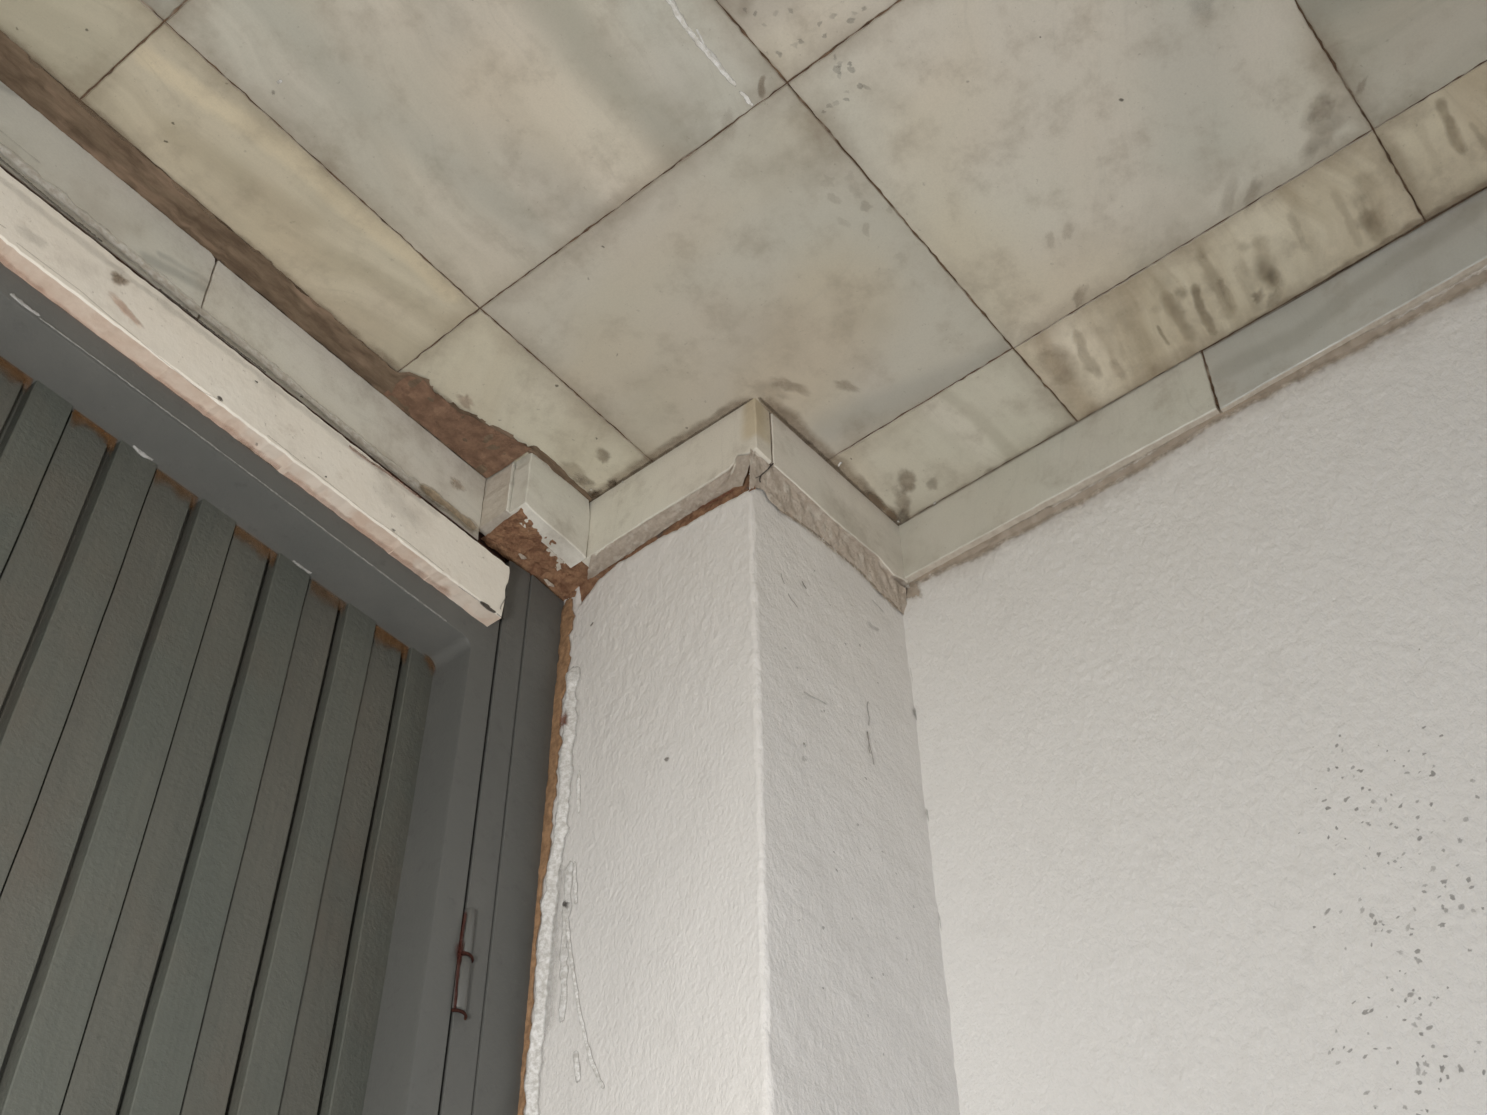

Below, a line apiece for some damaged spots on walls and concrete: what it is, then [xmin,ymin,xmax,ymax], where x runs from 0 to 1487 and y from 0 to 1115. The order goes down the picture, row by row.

spalling [0,30,592,502]
peeling [481,449,907,1115]